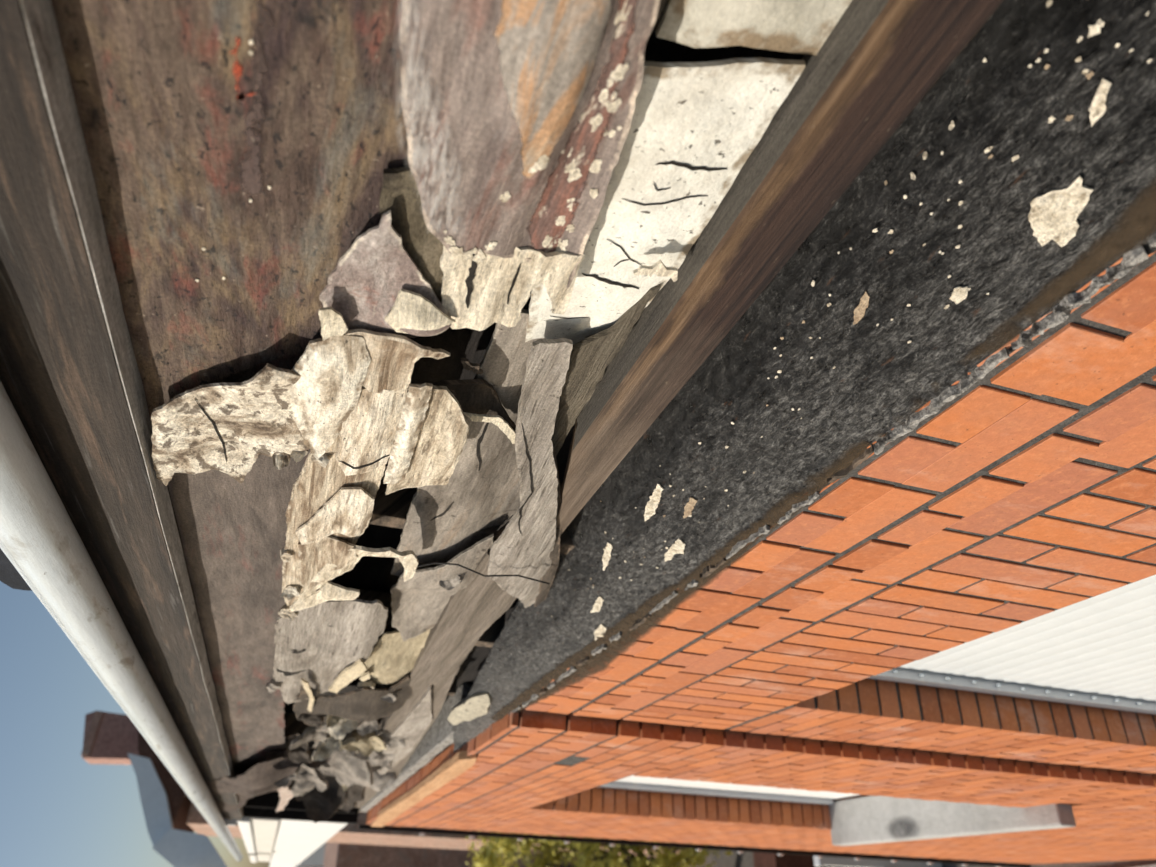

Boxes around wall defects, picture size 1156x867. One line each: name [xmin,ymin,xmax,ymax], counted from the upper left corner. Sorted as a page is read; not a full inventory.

crack [623,161,727,206]
peeling [319,210,456,338]
crack [582,239,641,289]
peeling [151,363,309,486]
spalling [509,231,1156,715]